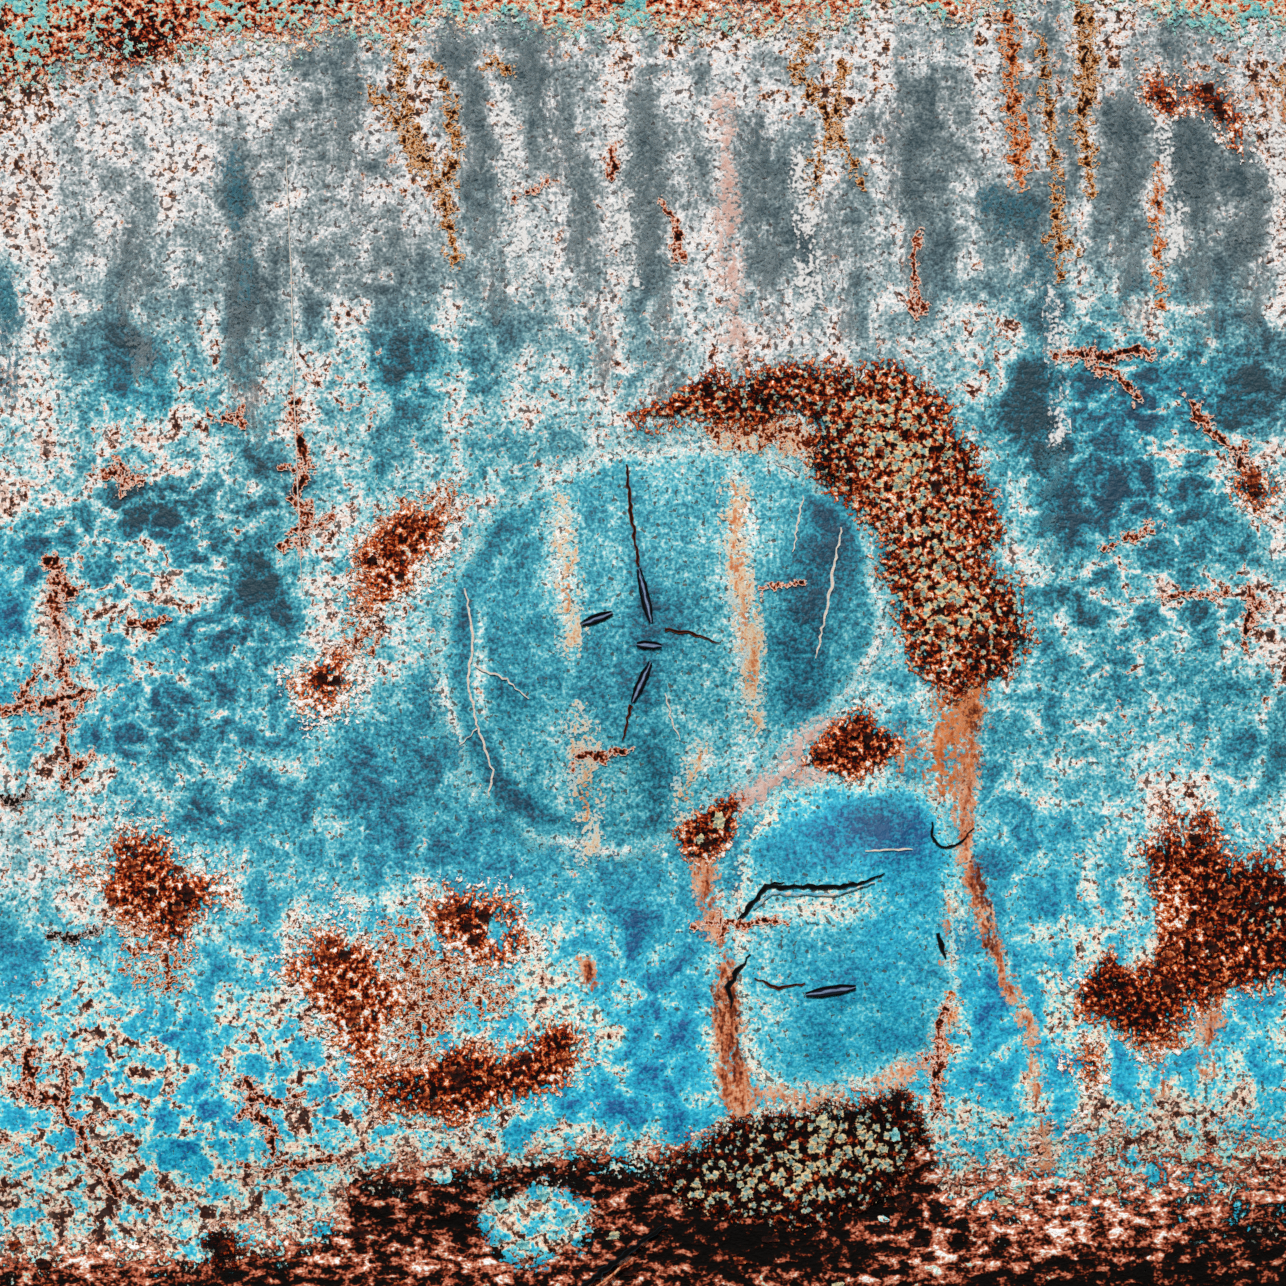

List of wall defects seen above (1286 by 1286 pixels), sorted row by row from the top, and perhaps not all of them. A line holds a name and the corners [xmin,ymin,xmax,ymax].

leakage [437,16,686,422]
corrosion [0,0,1286,283]
leakage [733,103,860,343]
leakage [1098,84,1286,357]
crack [566,464,721,773]
leakage [716,472,767,737]
corrosion [620,88,1044,1112]
leakage [560,699,607,867]
corrosion [267,871,610,1143]
corrosion [0,949,1286,1286]
crack [688,873,885,1009]
corrosion [1057,788,1286,1101]